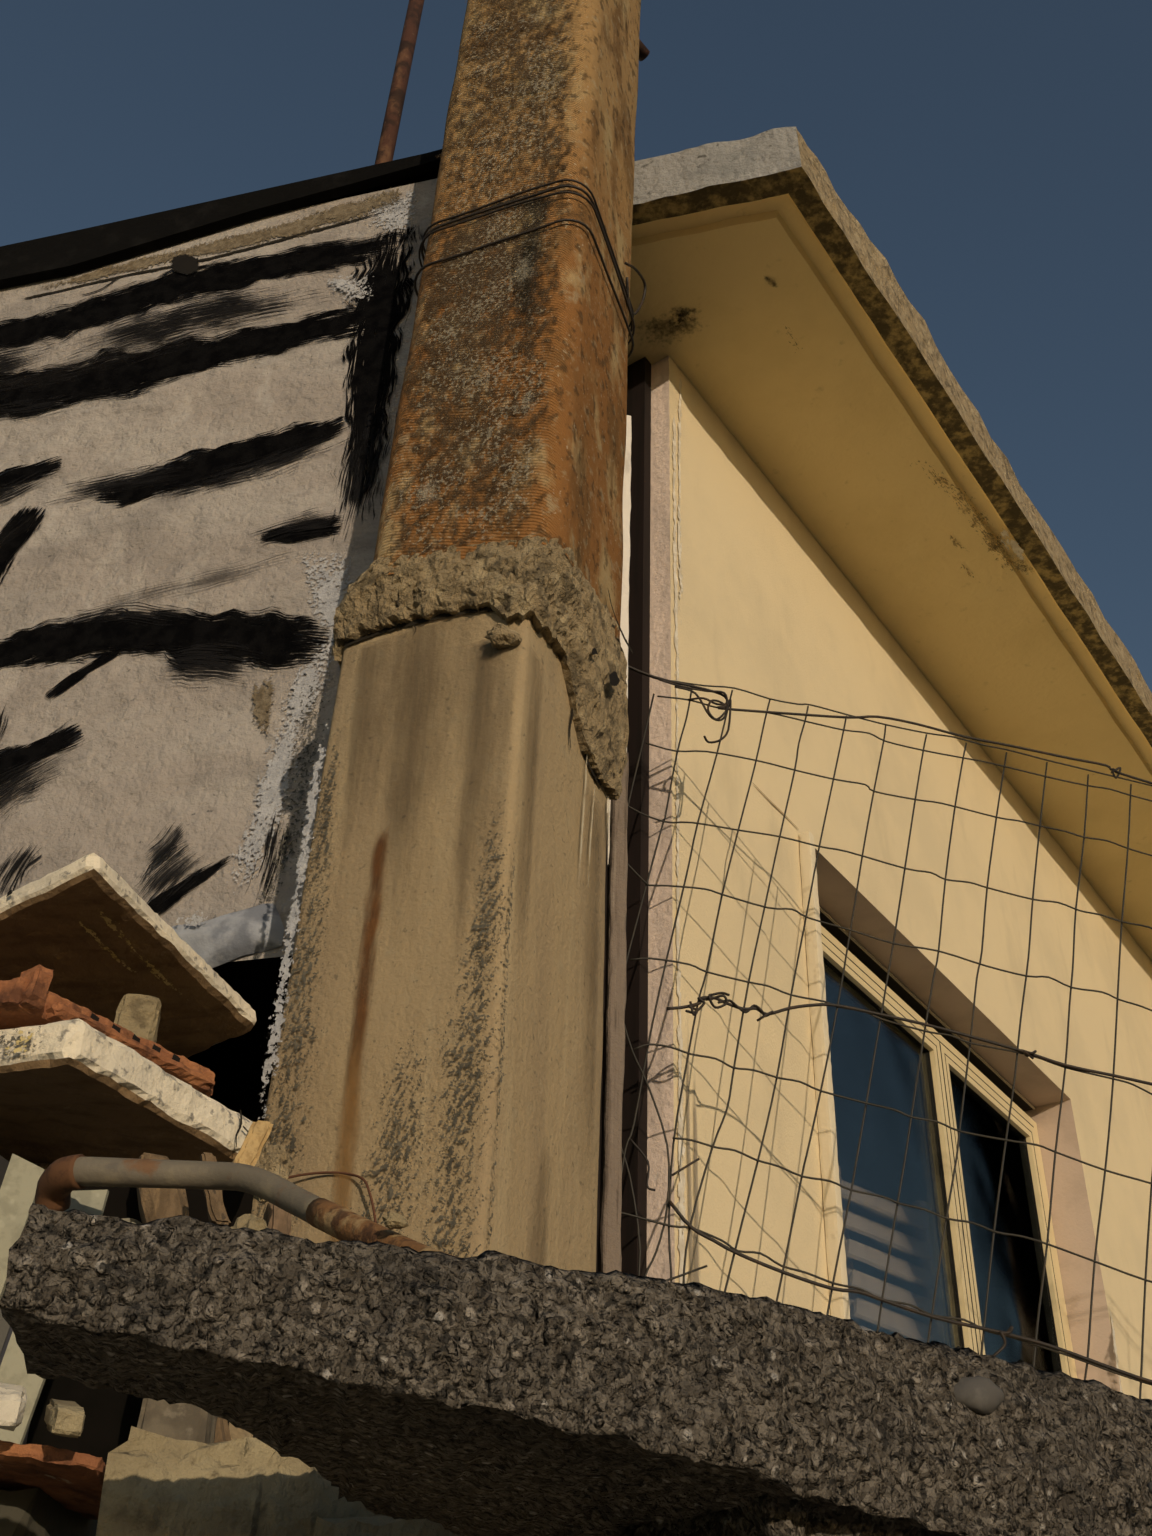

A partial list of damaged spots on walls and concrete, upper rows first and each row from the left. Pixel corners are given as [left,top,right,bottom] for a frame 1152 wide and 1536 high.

spalling [609,671,620,686]
corrosion [349,836,386,1108]